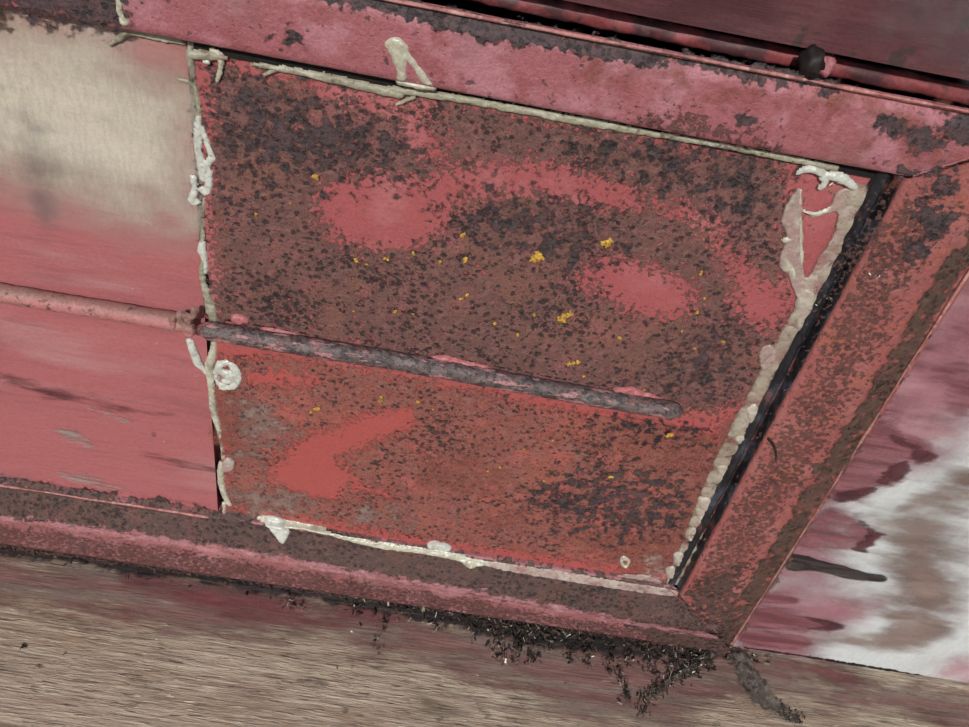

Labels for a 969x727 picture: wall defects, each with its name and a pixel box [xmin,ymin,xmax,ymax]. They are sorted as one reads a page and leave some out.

corrosion [0,0,133,35]
corrosion [266,22,307,51]
corrosion [873,110,969,157]
corrosion [897,164,921,183]
leakage [739,435,969,650]